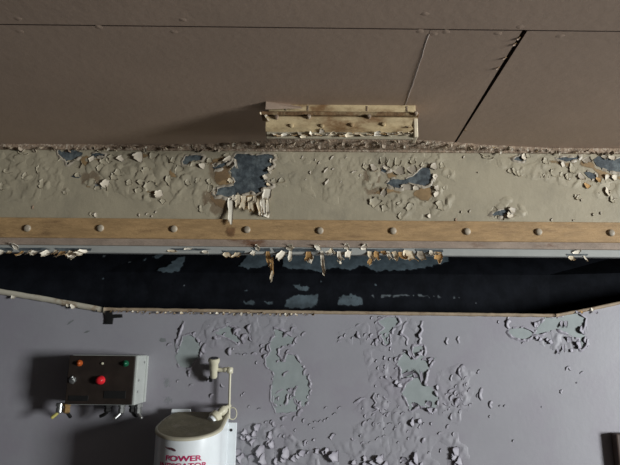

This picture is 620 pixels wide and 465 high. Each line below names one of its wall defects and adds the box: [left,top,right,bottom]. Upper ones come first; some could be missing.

peeling [56,150,285,225]
peeling [359,153,455,220]
peeling [487,196,529,220]
peeling [480,153,620,203]
peeling [0,242,92,260]
peeling [222,243,448,282]
peeling [338,294,363,306]
peeling [497,308,598,354]
peeling [110,284,342,438]
peeling [337,315,506,464]